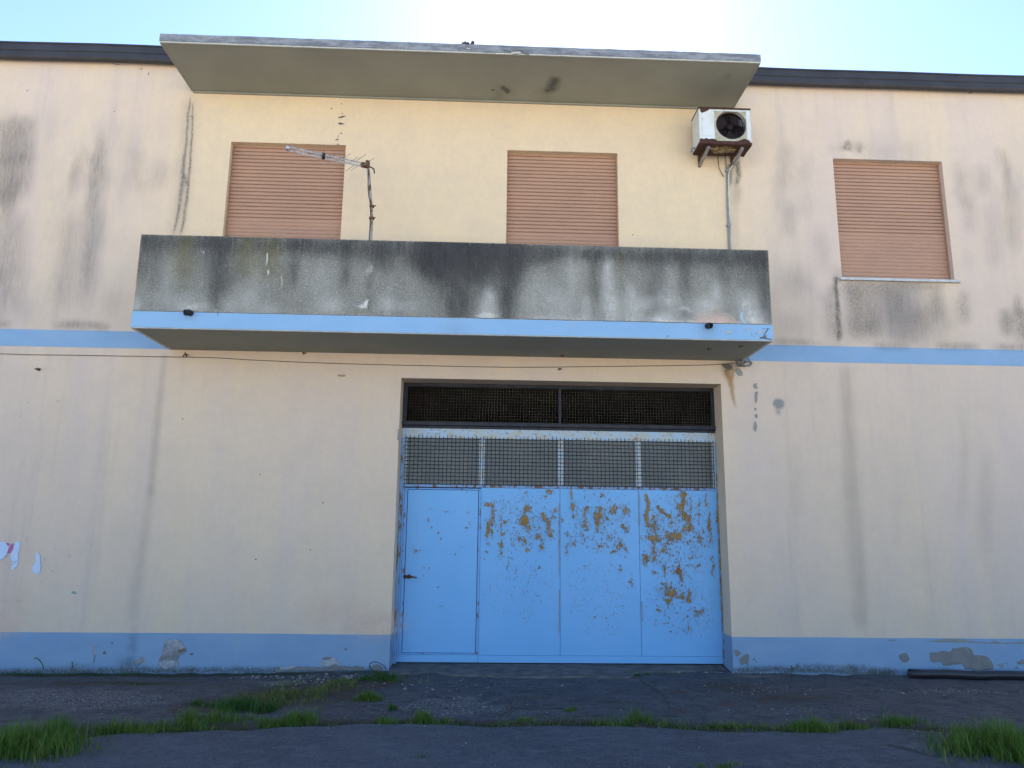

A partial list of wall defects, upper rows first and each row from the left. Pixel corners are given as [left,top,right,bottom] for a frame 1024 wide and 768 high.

leakage [139,234,770,324]
corrosion [484,486,723,639]
flaking render [134,639,193,670]
peeling [929,638,1024,671]